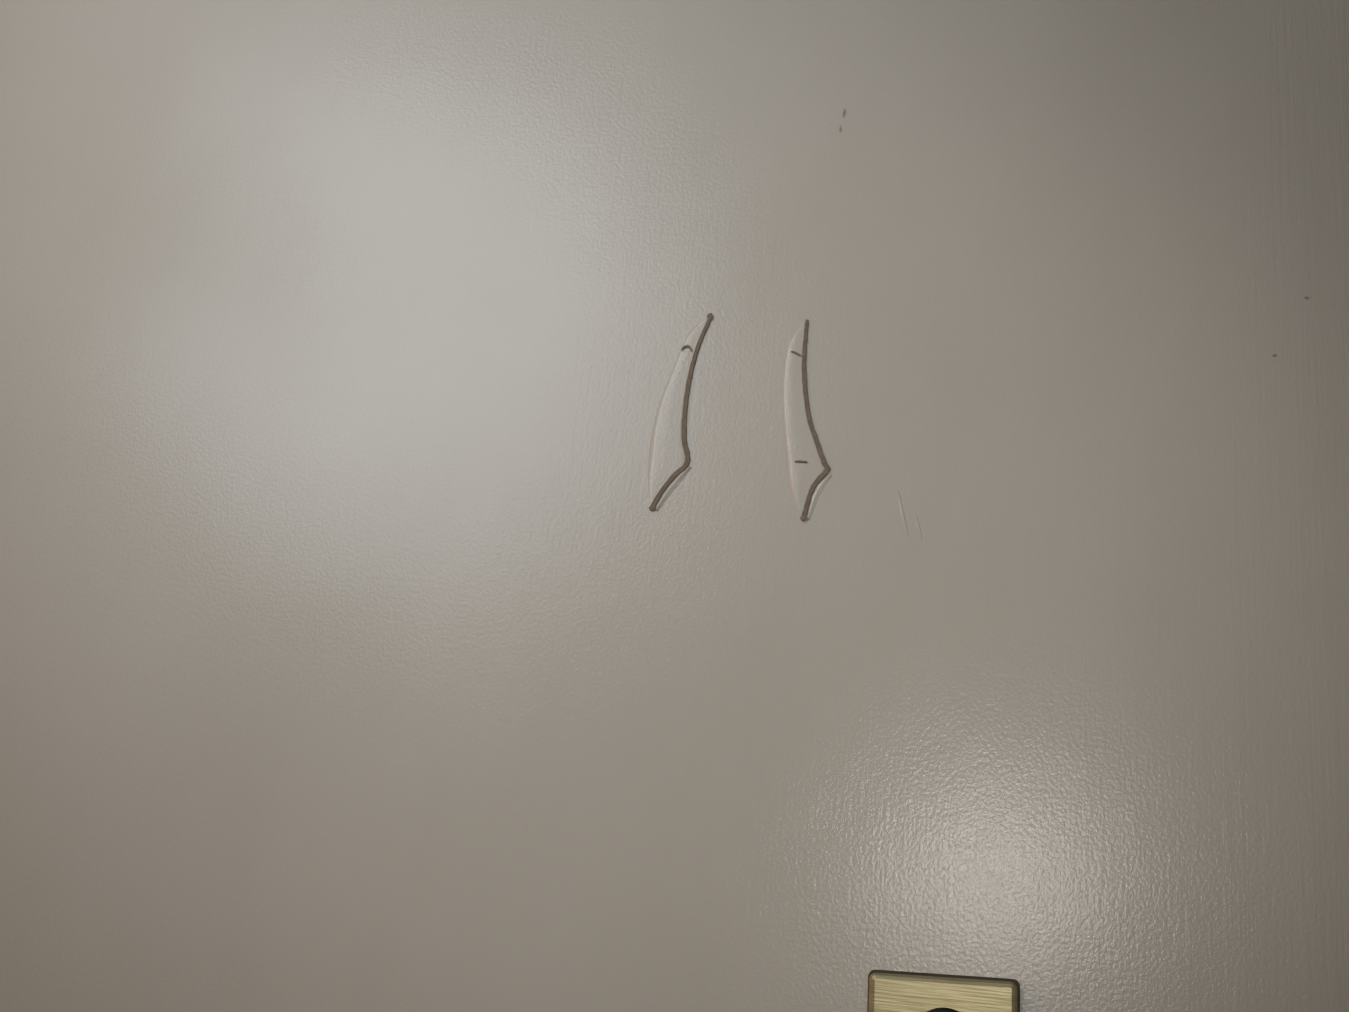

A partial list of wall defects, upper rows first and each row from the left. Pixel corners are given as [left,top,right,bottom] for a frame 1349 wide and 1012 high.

crack [648,313,713,511]
crack [782,319,832,521]